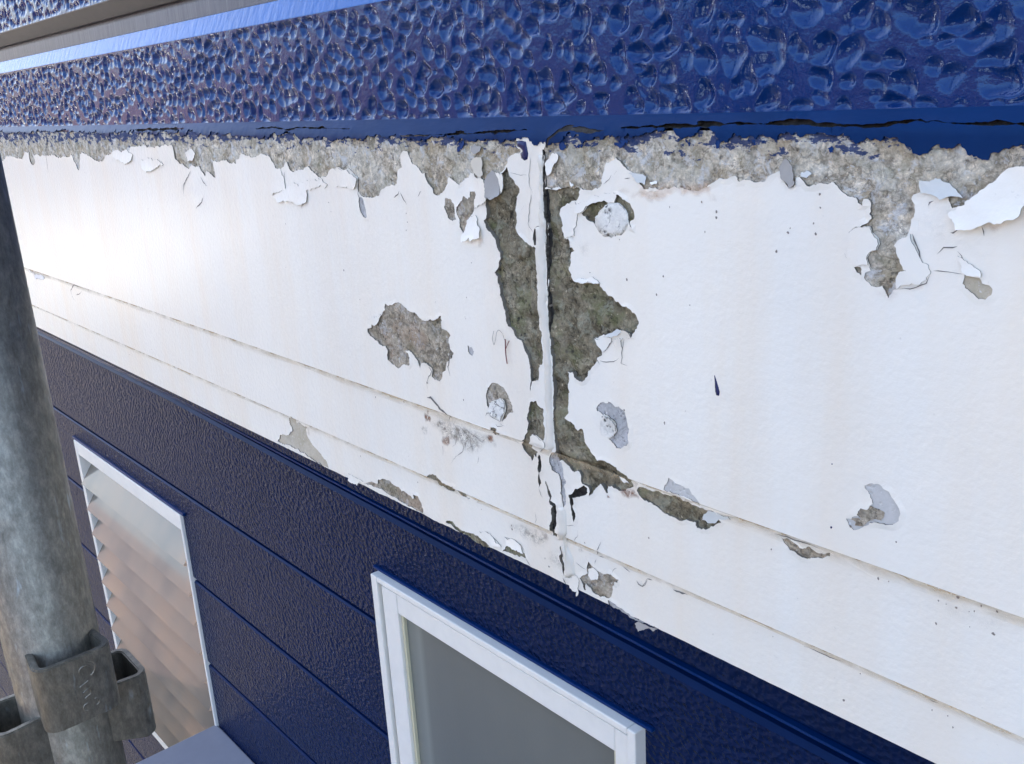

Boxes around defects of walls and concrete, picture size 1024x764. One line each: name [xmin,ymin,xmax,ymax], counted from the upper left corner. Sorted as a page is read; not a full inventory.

peeling [0,130,1024,530]
peeling [784,538,830,558]
peeling [565,563,658,632]